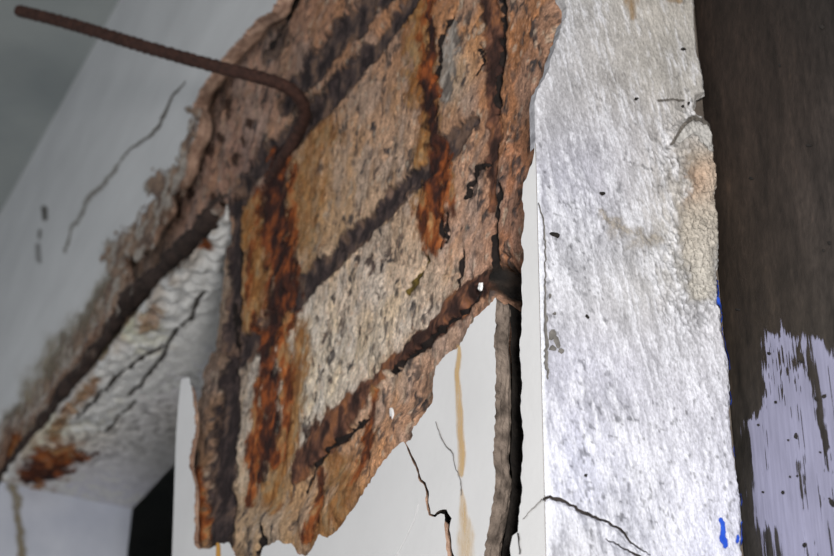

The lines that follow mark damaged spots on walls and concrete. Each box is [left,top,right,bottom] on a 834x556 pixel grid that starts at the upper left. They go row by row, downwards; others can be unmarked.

crack [64,81,186,253]
crack [75,291,208,433]
spalling [0,0,564,556]
crack [434,511,452,522]
crack [435,421,462,495]
crack [502,303,651,556]